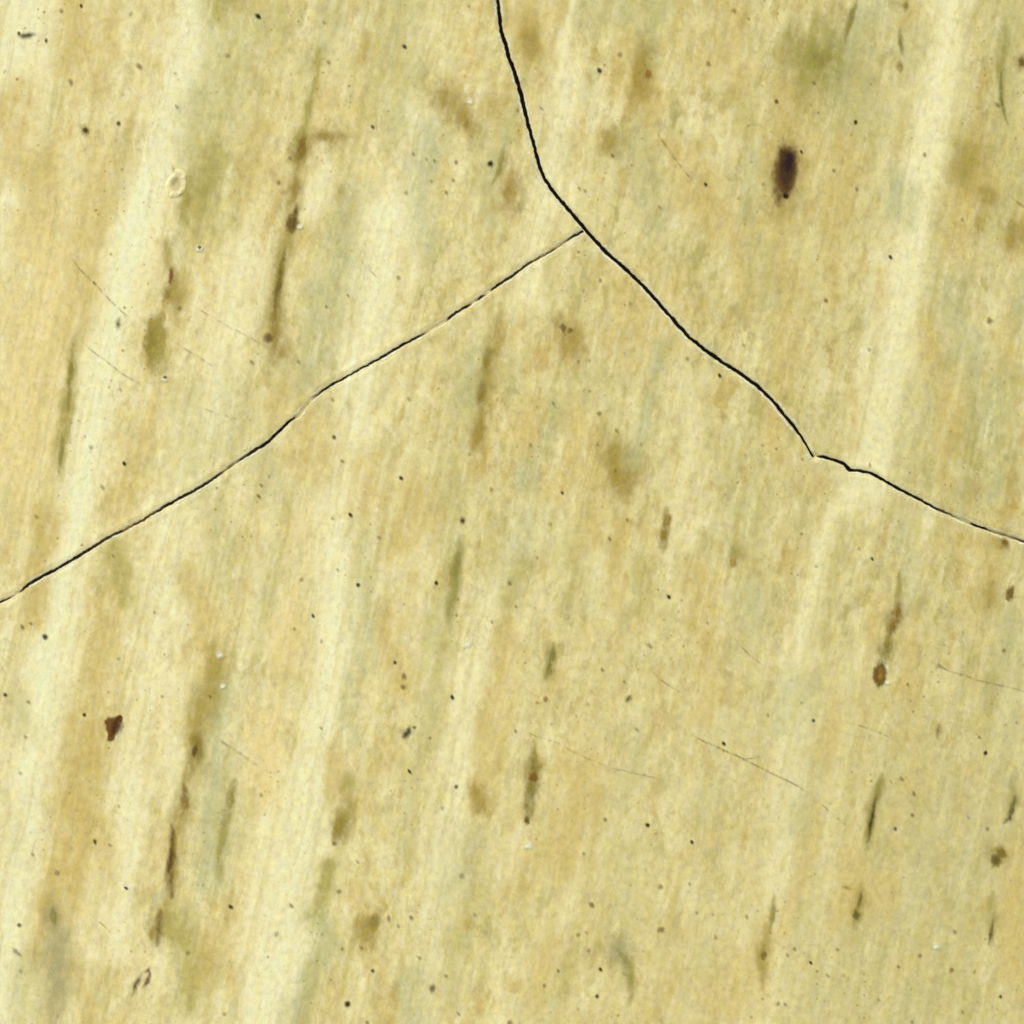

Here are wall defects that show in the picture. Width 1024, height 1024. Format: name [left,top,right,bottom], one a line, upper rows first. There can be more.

crack [0,0,1024,603]